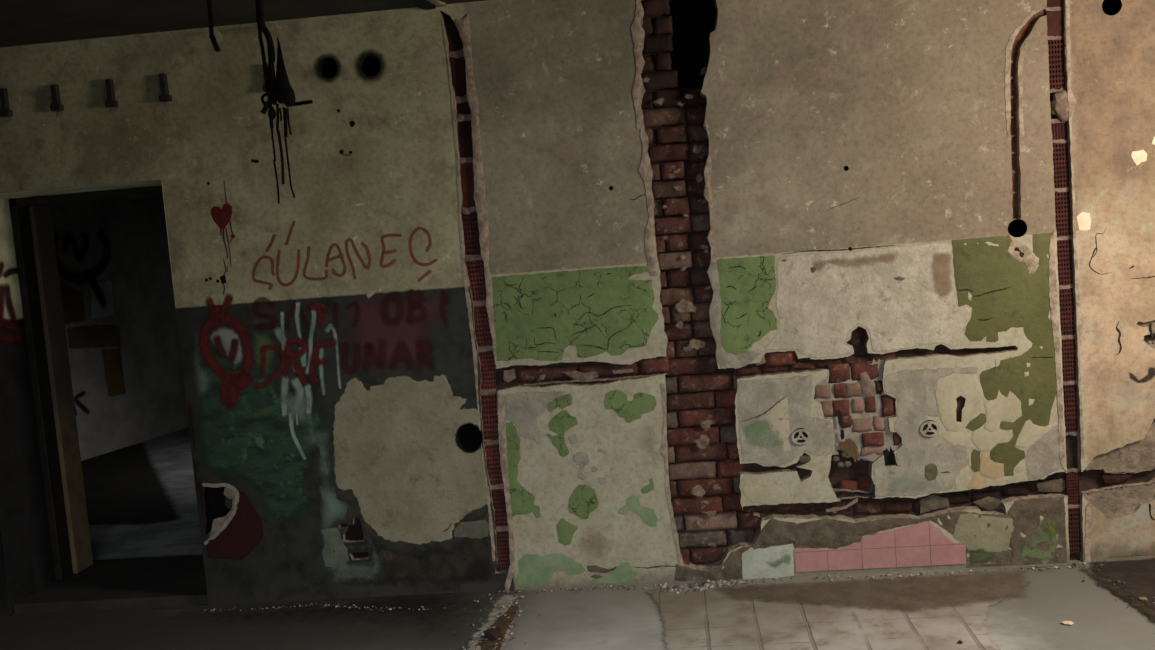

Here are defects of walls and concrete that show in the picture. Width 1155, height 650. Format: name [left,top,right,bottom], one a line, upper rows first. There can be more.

peeling [492,266,659,361]
peeling [604,390,657,423]
flaking render [717,219,1064,501]
spalling [202,483,239,545]
flaking render [317,374,491,581]
peeling [506,422,541,518]
peeling [515,393,638,587]
peeling [618,478,658,527]
flaking render [675,496,1068,581]
spalling [1083,418,1155,521]